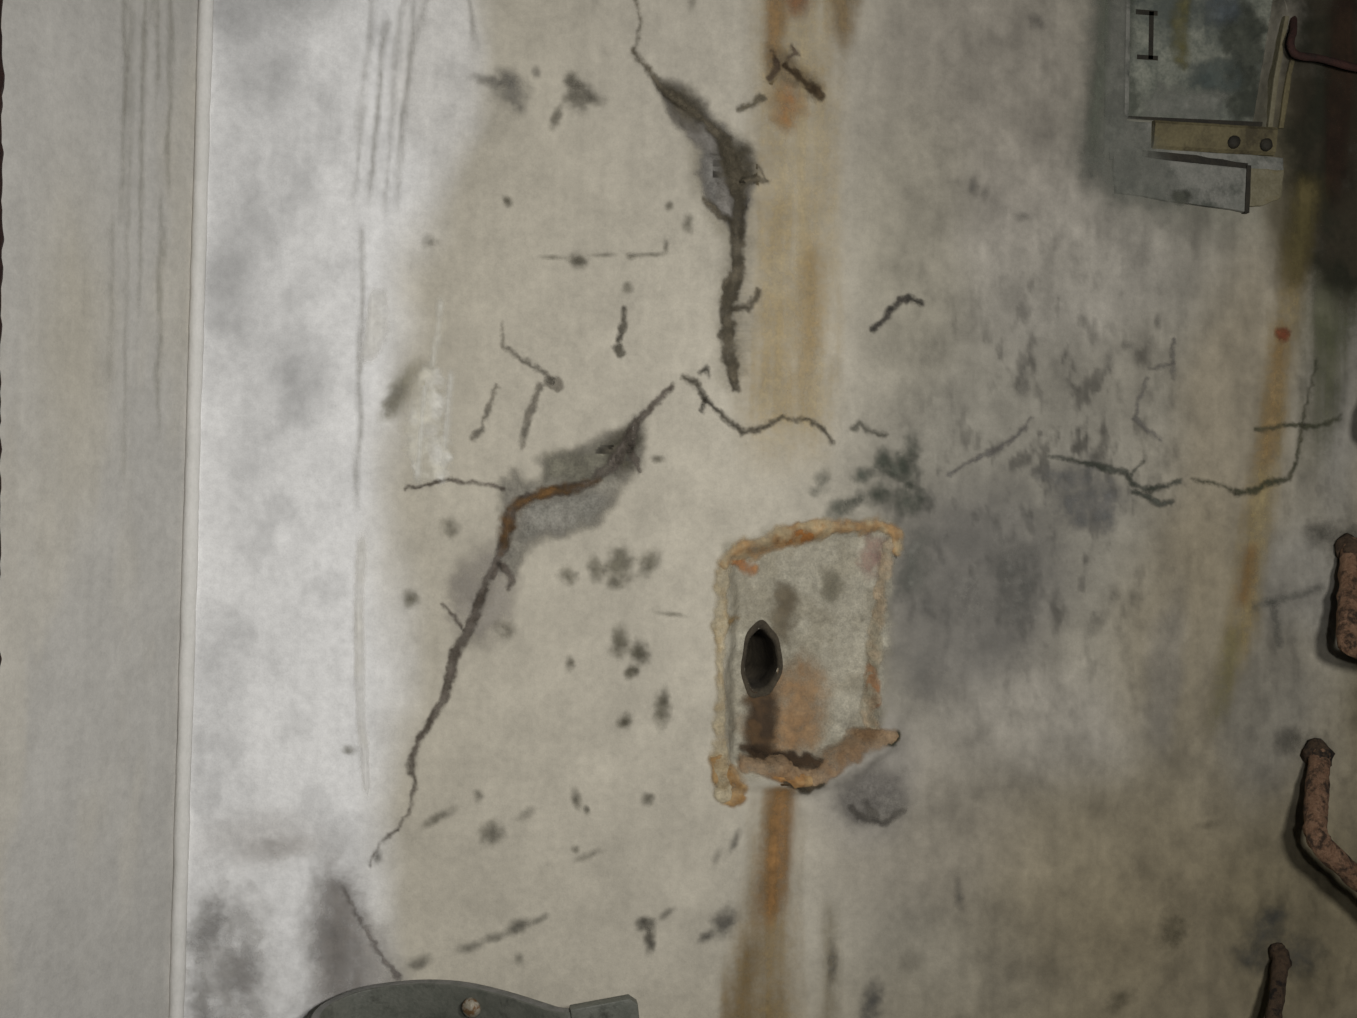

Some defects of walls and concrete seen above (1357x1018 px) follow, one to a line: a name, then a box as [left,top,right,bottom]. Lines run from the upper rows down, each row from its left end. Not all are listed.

spalling [662,85,753,227]
leakage [1284,0,1357,432]
crack [871,294,923,331]
spalling [501,424,644,572]
crack [388,47,886,836]
leakage [858,448,922,506]
crack [949,427,1026,475]
crack [1052,401,1332,507]